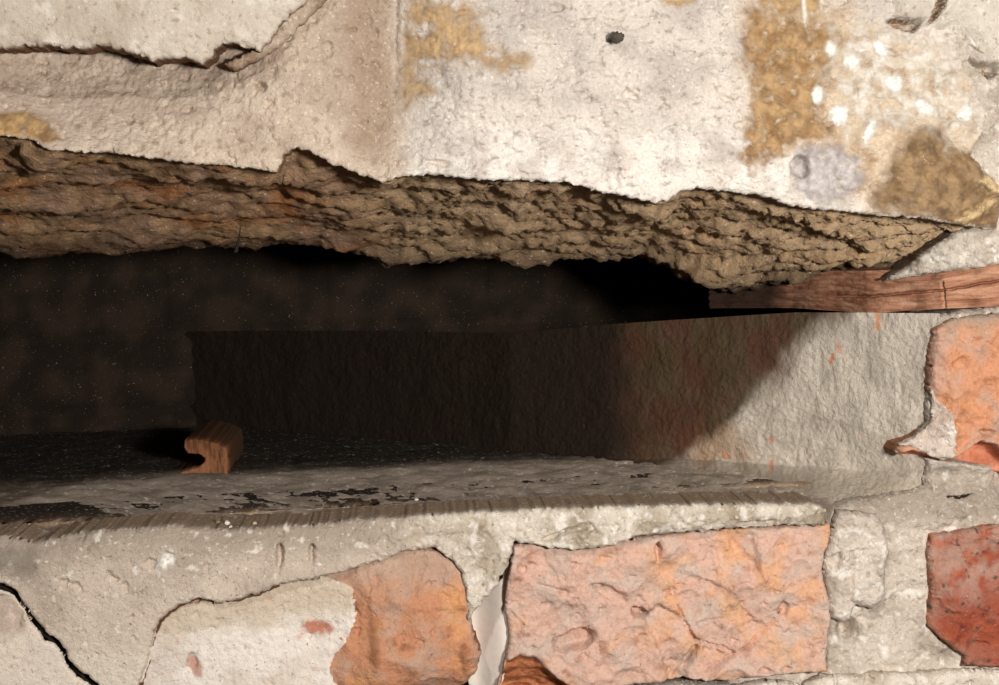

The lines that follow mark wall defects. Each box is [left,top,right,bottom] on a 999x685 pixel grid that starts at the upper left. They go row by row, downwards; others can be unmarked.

peeling [953,175,999,224]
peeling [155,548,177,571]
crack [0,583,99,685]
crack [139,584,280,685]